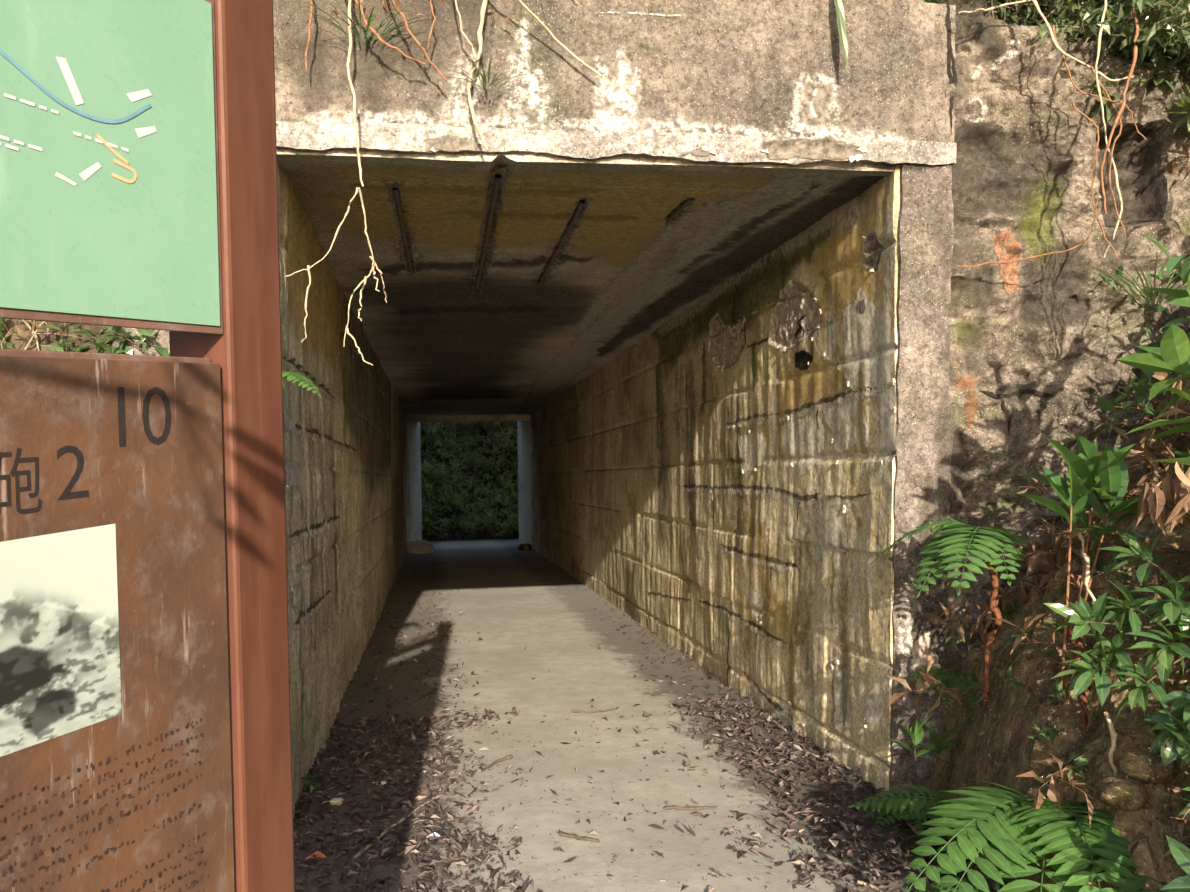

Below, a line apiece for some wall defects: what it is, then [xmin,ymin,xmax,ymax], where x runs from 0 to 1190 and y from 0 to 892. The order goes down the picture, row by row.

water stain [313,21,772,137]
water stain [786,130,898,141]
spalling [389,181,417,277]
spalling [471,165,511,294]
rust [322,166,764,263]
rust [284,176,354,441]
crack [725,386,881,428]
crack [678,459,870,584]
crack [644,591,793,722]